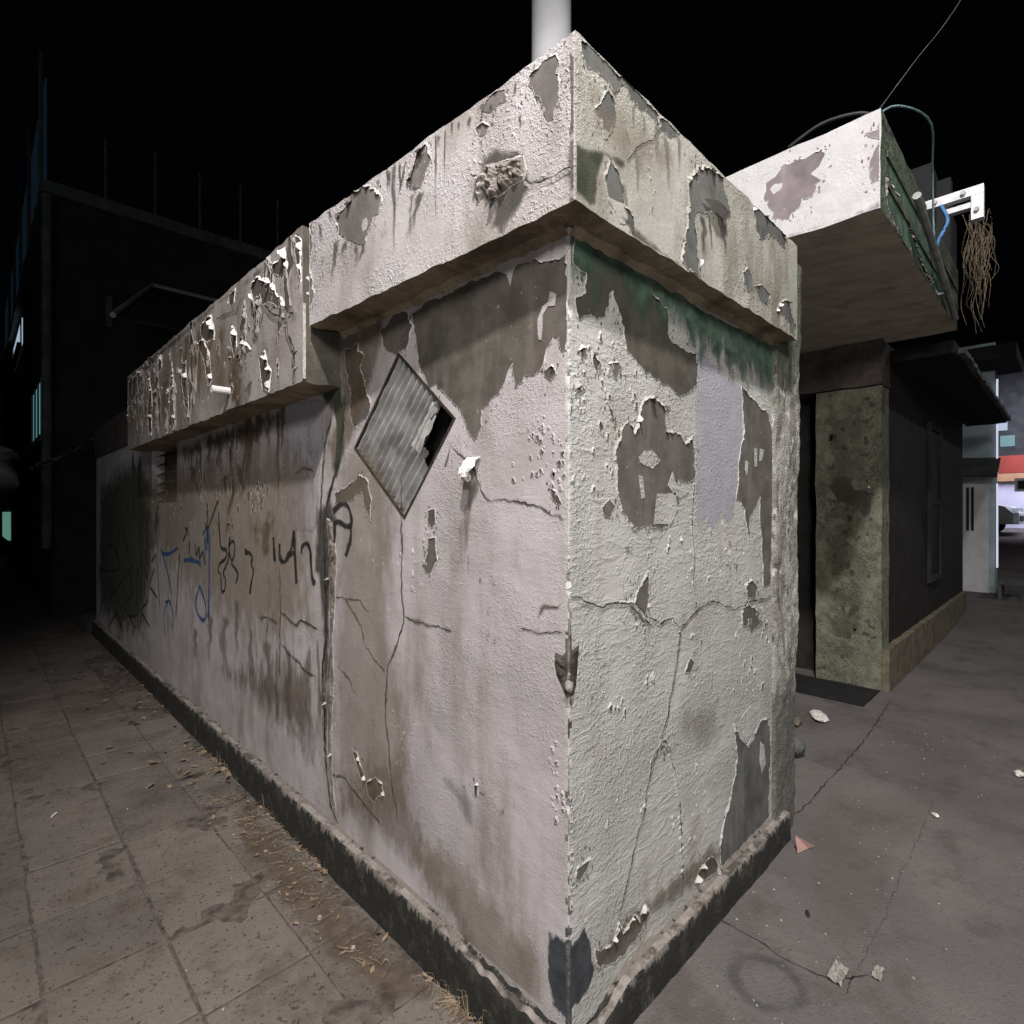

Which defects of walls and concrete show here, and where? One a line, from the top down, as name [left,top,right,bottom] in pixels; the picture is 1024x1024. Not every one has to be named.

peeling [471,38,680,233]
peeling [753,144,832,249]
damp [98,453,159,639]
spalling [126,224,318,440]
damp [183,406,285,493]
damp [316,501,336,681]
crack [260,410,450,827]
crack [443,445,558,516]
flaking render [377,238,699,646]
crack [520,481,772,920]
damp [714,342,746,380]
flaking render [705,386,773,647]